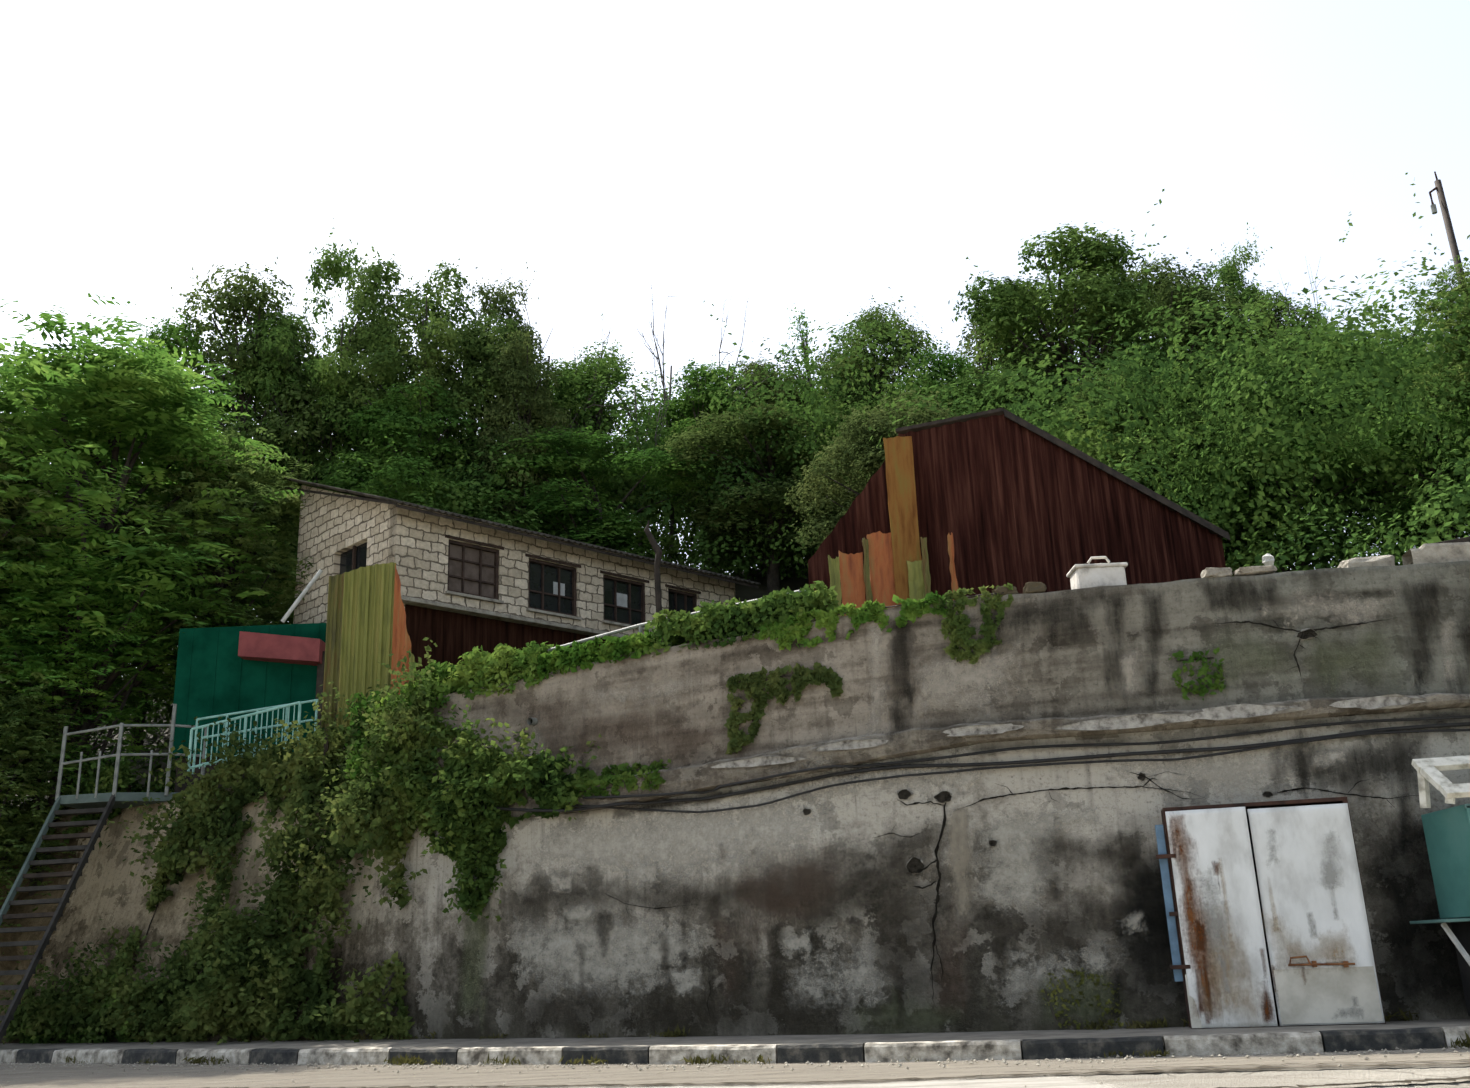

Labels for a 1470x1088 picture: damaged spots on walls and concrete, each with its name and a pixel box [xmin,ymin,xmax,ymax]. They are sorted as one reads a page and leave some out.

damp [1110,595,1161,692]
damp [1208,583,1276,610]
crack [1219,617,1399,680]
damp [1406,584,1470,694]
damp [515,839,928,1031]
crack [875,771,1206,1015]
rust [1172,820,1218,1023]
rust [1261,950,1276,1021]